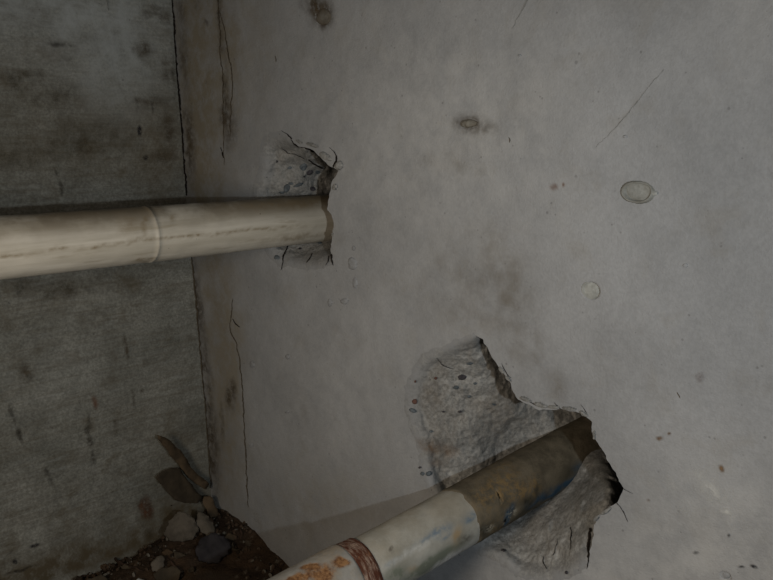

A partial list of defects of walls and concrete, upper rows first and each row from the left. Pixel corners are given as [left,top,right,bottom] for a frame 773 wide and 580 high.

crack [171,0,187,196]
crack [217,0,233,160]
spalling [250,131,344,199]
spalling [265,233,334,271]
crack [229,300,249,508]
spalling [404,333,588,496]
spalling [470,449,623,580]